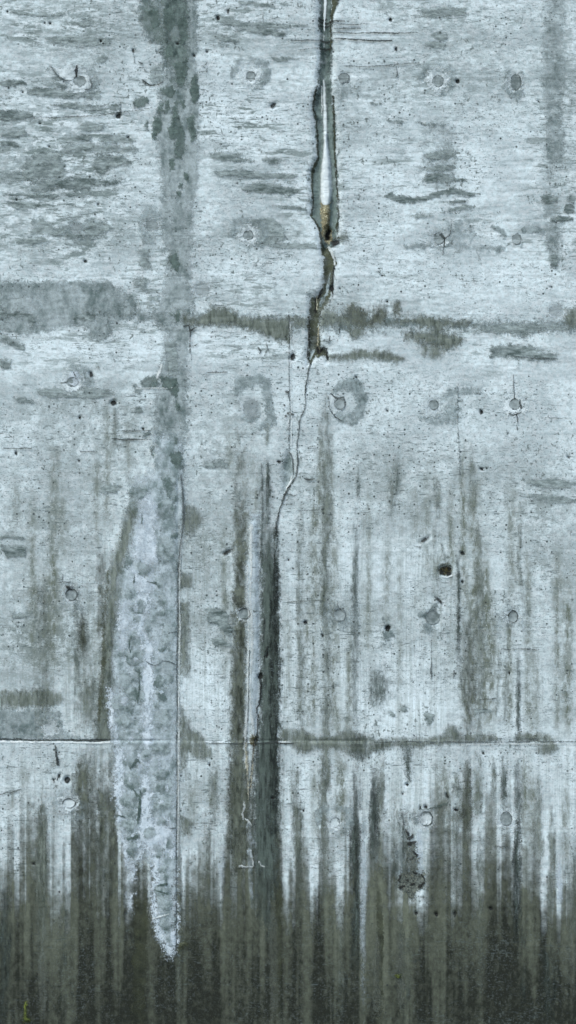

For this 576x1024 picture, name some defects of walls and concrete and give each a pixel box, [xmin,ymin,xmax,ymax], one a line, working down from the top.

damp [132,96,149,107]
crack [258,0,420,539]
damp [320,301,576,365]
damp [320,431,331,643]
damp [179,715,212,768]
damp [295,594,304,720]
damp [350,551,358,688]
damp [370,672,386,704]
damp [459,624,483,730]
damp [495,672,558,755]
damp [473,774,483,813]
damp [492,767,508,800]